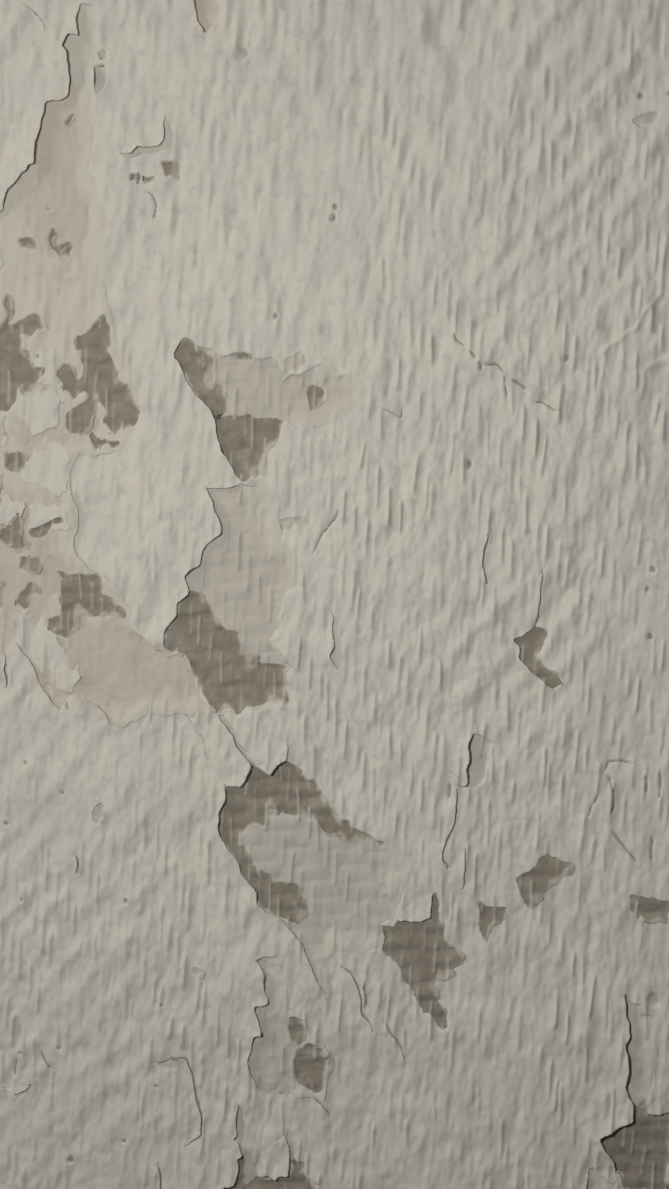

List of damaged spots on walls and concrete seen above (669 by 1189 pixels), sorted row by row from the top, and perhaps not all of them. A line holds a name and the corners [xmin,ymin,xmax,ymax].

peeling [0,4,466,1101]
peeling [503,626,564,689]
peeling [478,900,507,942]
peeling [517,853,575,909]
peeling [629,894,669,924]
peeling [577,994,669,1189]
peeling [200,1106,326,1189]